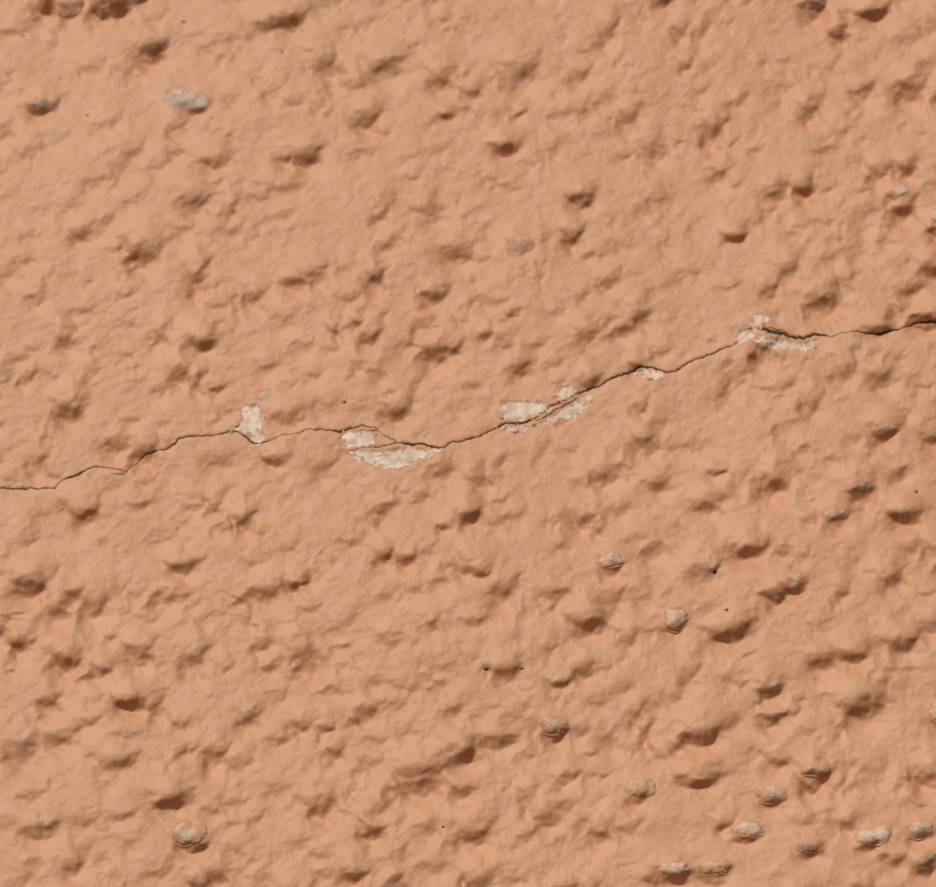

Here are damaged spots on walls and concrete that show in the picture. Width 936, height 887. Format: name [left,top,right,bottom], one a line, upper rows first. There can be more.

peeling [734,312,819,353]
peeling [228,388,273,447]
crack [0,320,936,490]
peeling [495,383,594,433]
peeling [335,427,443,471]